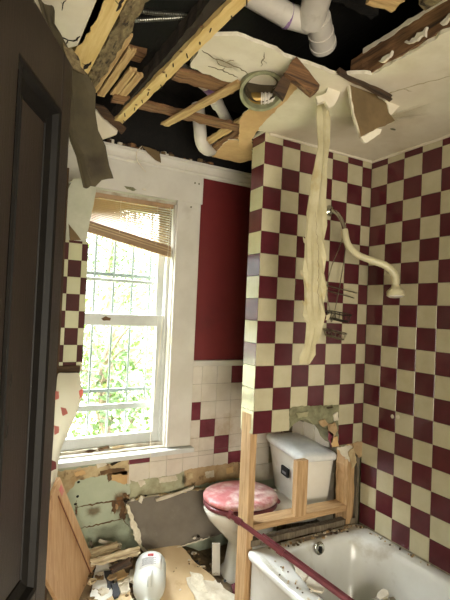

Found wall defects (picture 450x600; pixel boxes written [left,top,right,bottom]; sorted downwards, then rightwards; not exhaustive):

crack [202,50,248,77]
spalling [95,109,118,139]
spalling [289,405,363,469]
spalling [57,460,240,520]